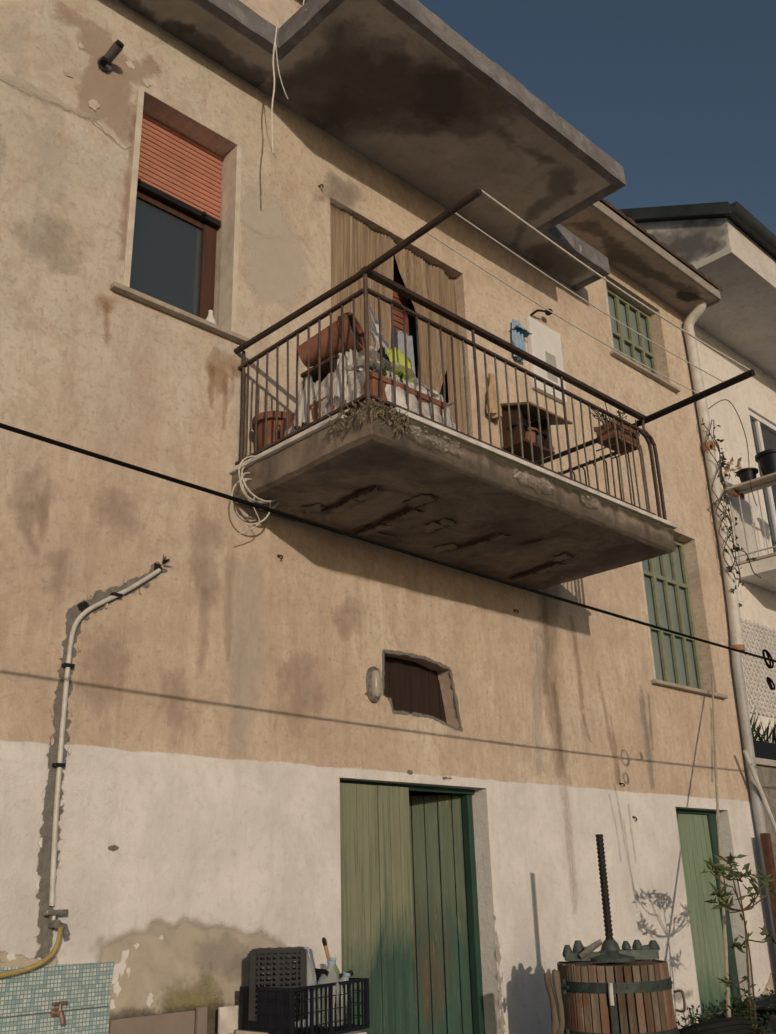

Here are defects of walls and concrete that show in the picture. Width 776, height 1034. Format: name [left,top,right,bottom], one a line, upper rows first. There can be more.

peeling [62,11,158,140]
damp [574,222,701,302]
damp [654,221,724,262]
spalling [512,469,554,495]
peeling [98,919,293,1034]